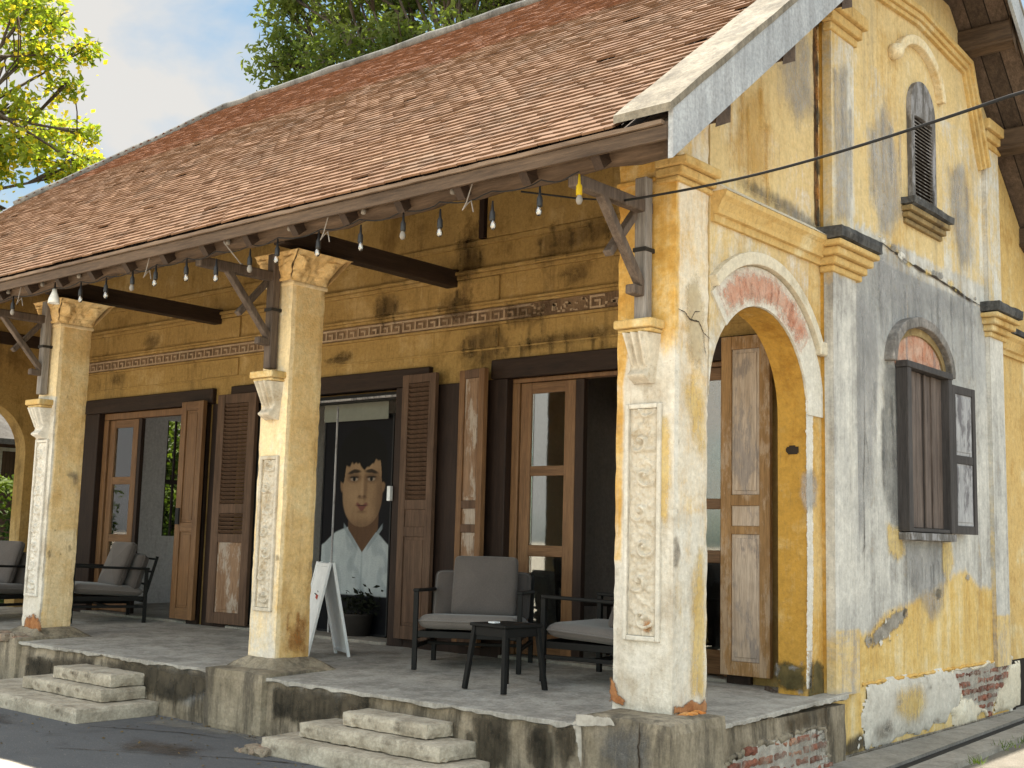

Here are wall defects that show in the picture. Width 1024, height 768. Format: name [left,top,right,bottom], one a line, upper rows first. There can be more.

crack [679,309,709,353]
water stain [857,304,898,529]
peeling [865,609,908,648]
flaking render [862,656,1013,717]
flaking render [724,724,833,768]